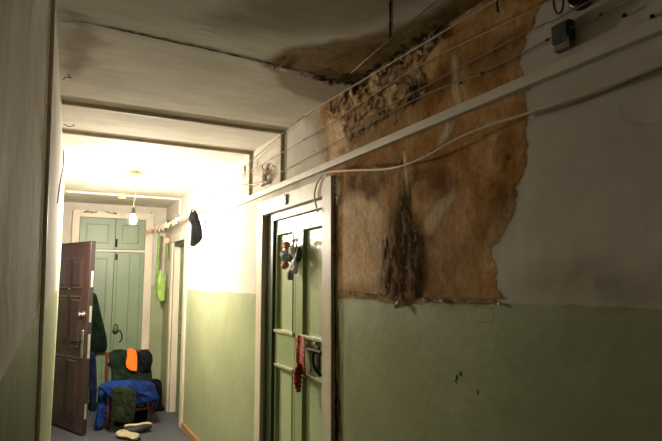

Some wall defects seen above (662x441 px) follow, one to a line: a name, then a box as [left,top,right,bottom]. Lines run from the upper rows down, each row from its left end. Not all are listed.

crack [60,21,348,88]
flaking render [322,28,443,140]
crack [386,0,394,47]
leakage [267,0,547,303]